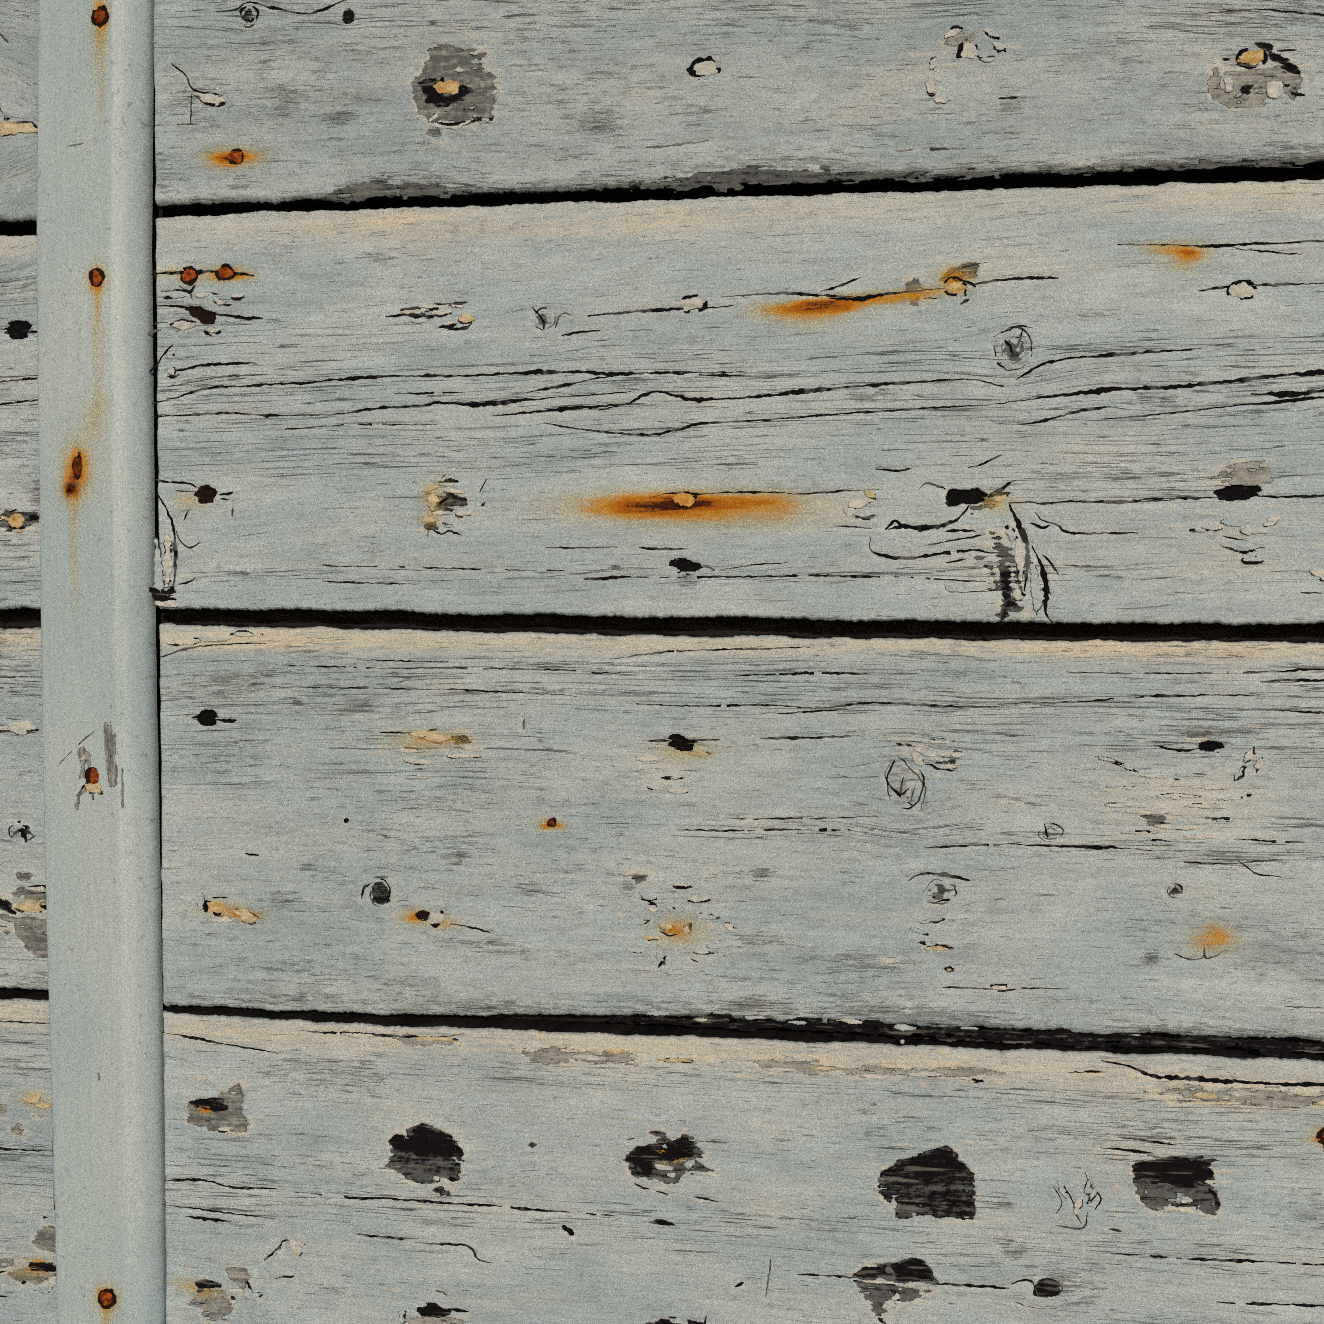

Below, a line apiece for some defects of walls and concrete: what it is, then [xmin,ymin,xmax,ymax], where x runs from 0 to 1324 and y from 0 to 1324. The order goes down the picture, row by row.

peeling [410,43,497,138]
peeling [1207,42,1305,108]
rust [764,270,964,319]
rust [62,448,88,502]
rust [582,492,795,521]
peeling [0,872,48,958]
peeling [186,1083,250,1133]
peeling [380,1123,465,1196]
peeling [623,1131,727,1195]
peeling [877,1145,976,1220]
peeling [1111,1137,1221,1216]
peeling [852,1258,940,1324]